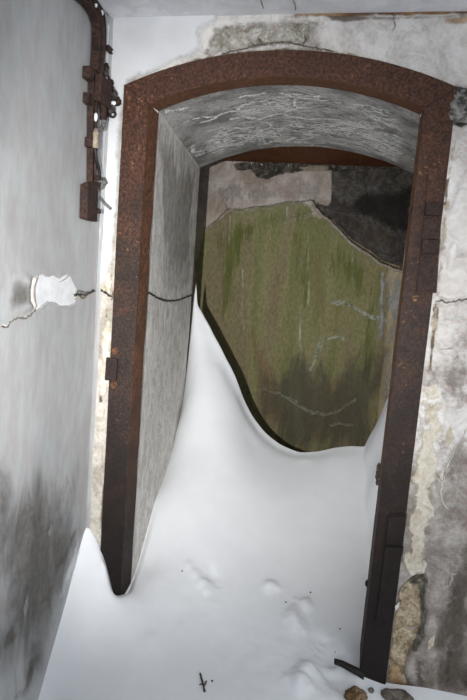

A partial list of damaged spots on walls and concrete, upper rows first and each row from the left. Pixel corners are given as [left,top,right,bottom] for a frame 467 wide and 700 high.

spalling [205,22,317,56]
leakage [184,92,414,162]
crack [207,199,403,273]
crack [0,310,36,328]
peeling [31,274,77,310]
crack [74,283,113,300]
crack [148,292,192,313]
leakage [331,272,400,339]
leakage [262,335,392,449]
peeling [387,385,455,685]
leakage [0,486,72,685]
leakage [417,568,467,691]